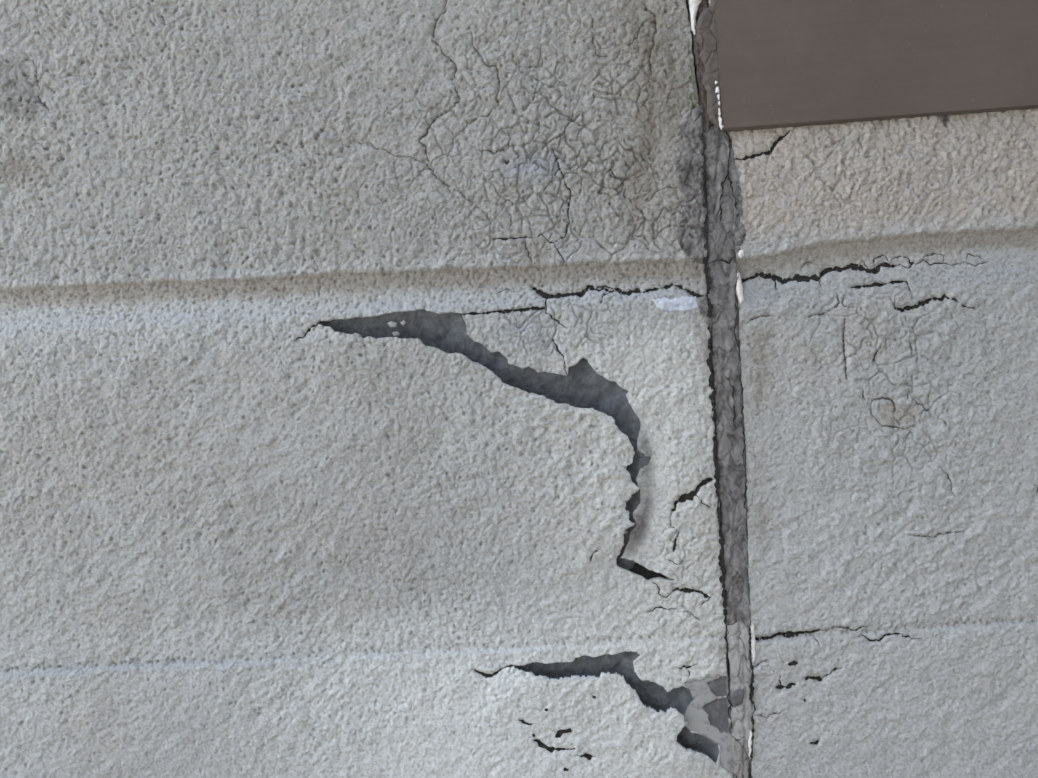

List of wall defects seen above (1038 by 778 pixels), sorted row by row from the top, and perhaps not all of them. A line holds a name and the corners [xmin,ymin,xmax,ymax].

crack [358,1,571,265]
crack [629,4,657,76]
spalling [319,309,668,580]
crack [462,131,988,778]
spalling [513,651,750,773]